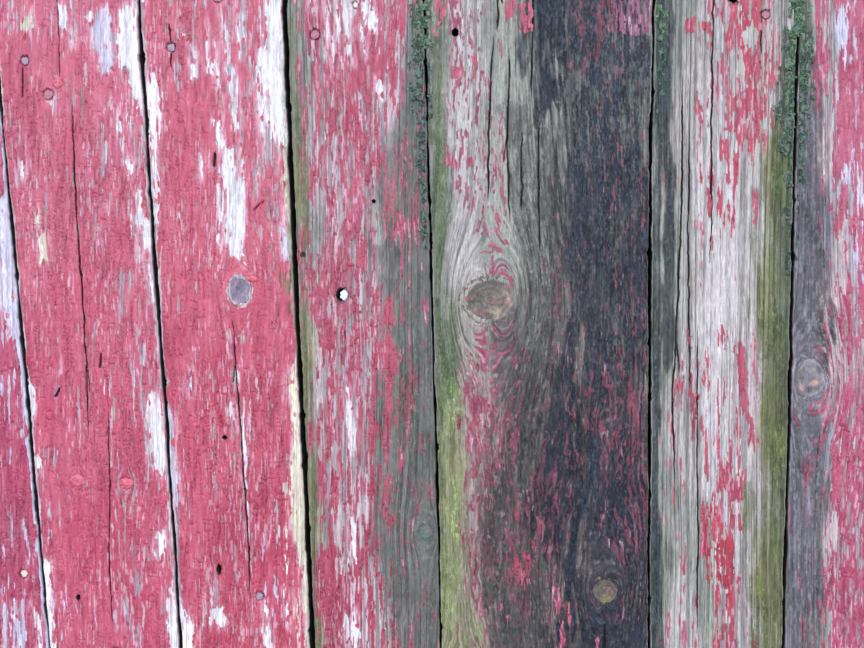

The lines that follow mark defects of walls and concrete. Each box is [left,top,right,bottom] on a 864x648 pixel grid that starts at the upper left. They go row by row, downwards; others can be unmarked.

peeling [325,0,378,65]
peeling [84,0,163,300]
peeling [190,0,291,265]
peeling [0,194,18,345]
crack [72,111,113,621]
peeling [146,390,178,508]
crack [232,321,251,595]
peeling [284,364,309,648]
peeling [704,458,747,589]
peeling [720,324,755,441]
peeling [32,559,57,648]
peeling [165,580,197,648]